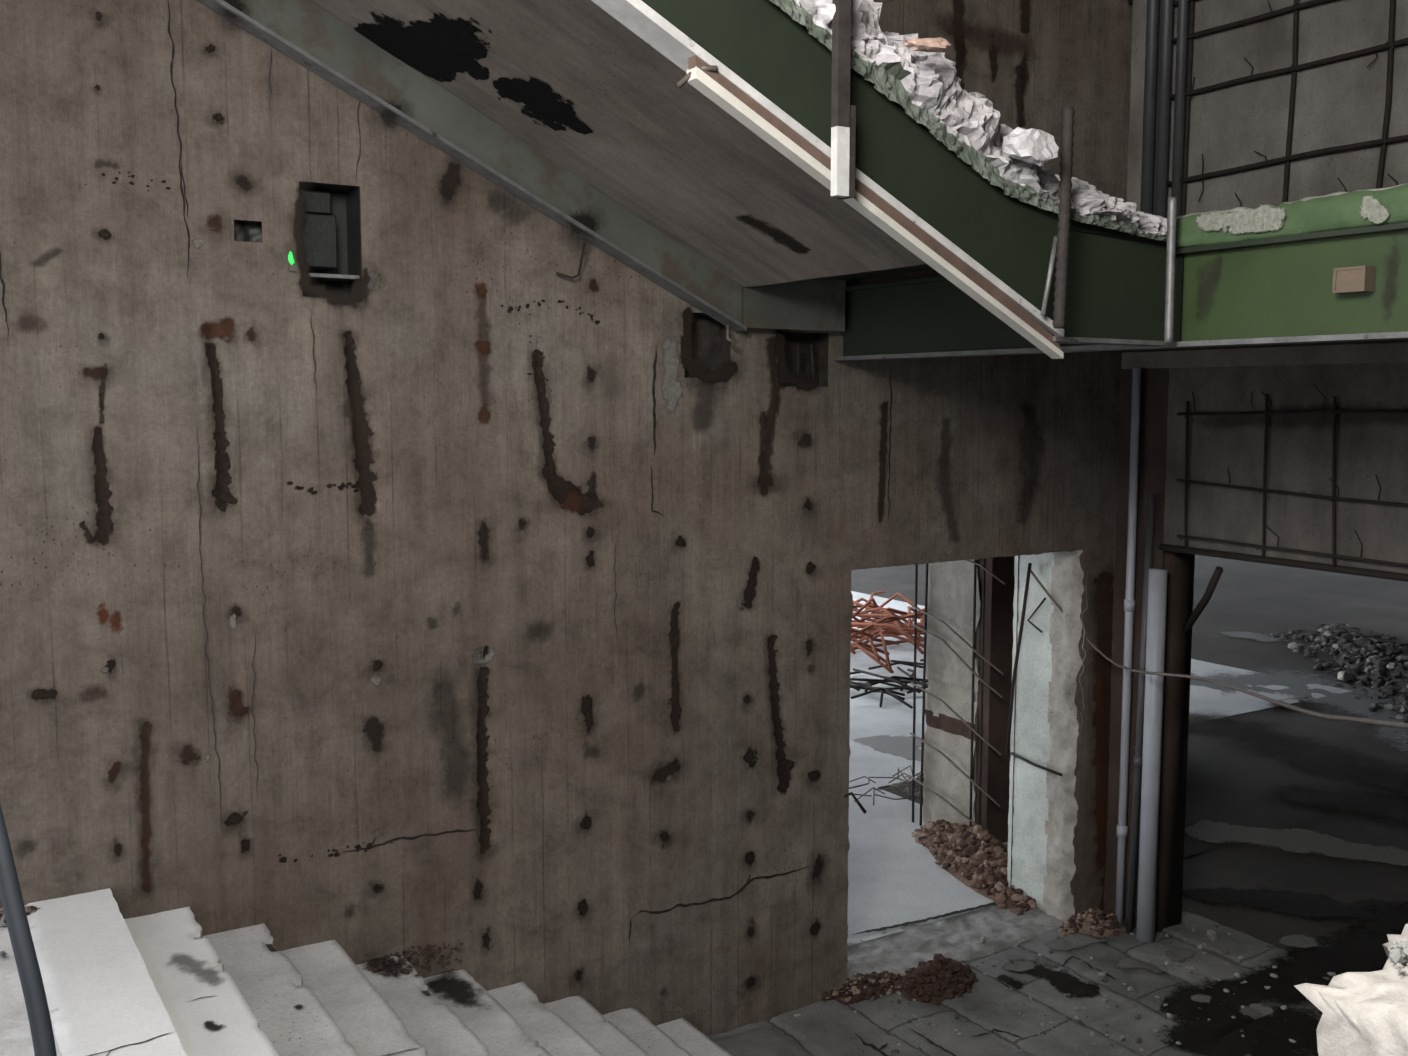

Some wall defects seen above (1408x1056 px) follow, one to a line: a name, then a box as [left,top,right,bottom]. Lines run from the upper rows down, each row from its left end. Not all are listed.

flaking render [353,11,593,135]
flaking render [736,215,810,254]
spalling [1040,107,1075,329]
peeling [1196,204,1287,234]
peeling [1359,195,1389,224]
rust [83,367,106,424]
water stain [994,959,1100,998]
water stain [1156,887,1408,1056]